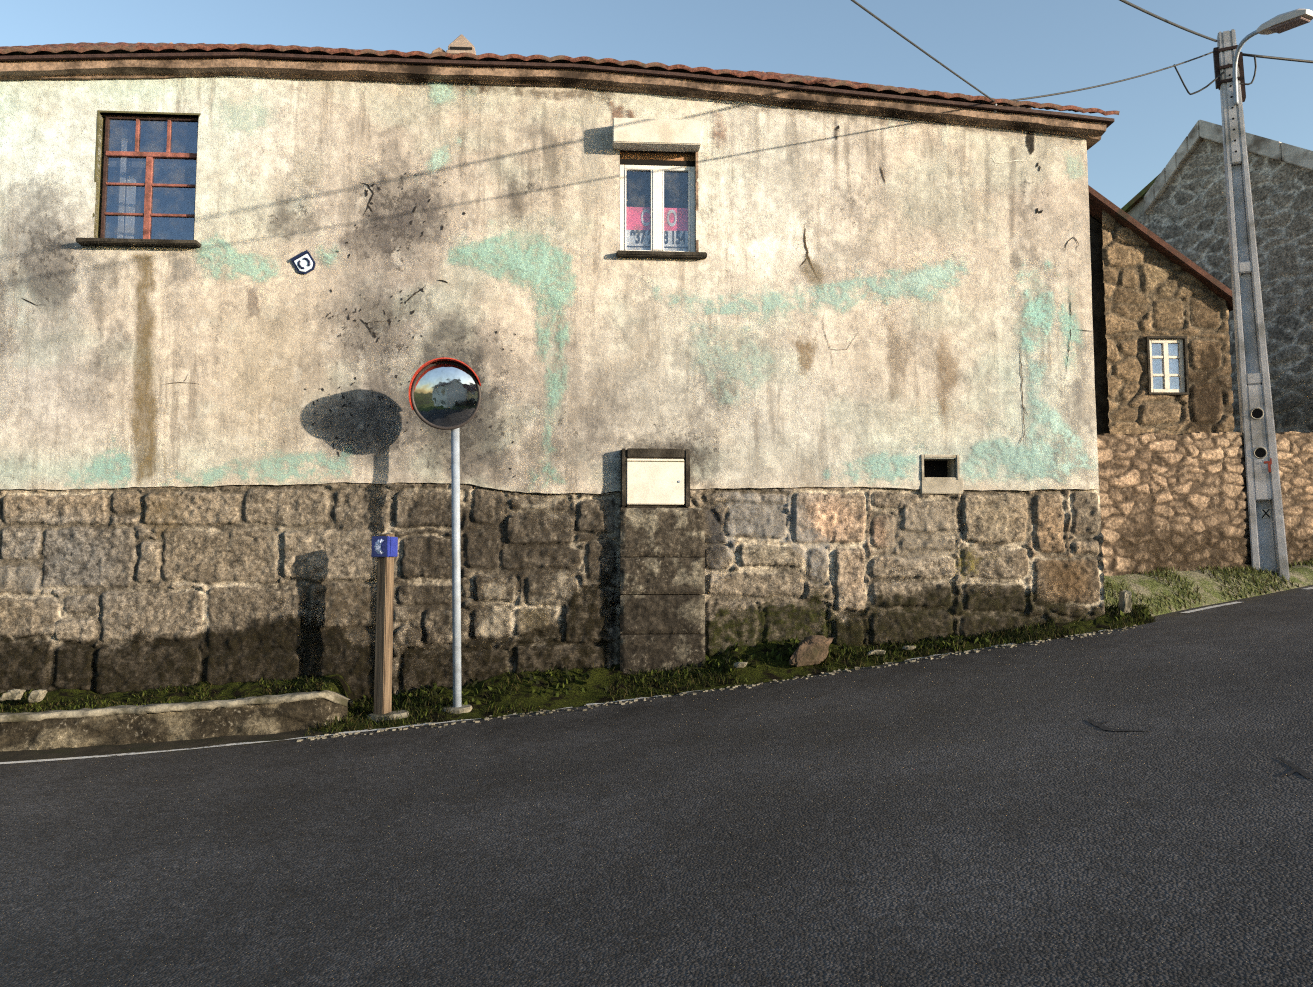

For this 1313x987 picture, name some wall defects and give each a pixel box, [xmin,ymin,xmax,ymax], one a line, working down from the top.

leakage [336,169,447,258]
leakage [305,288,516,478]